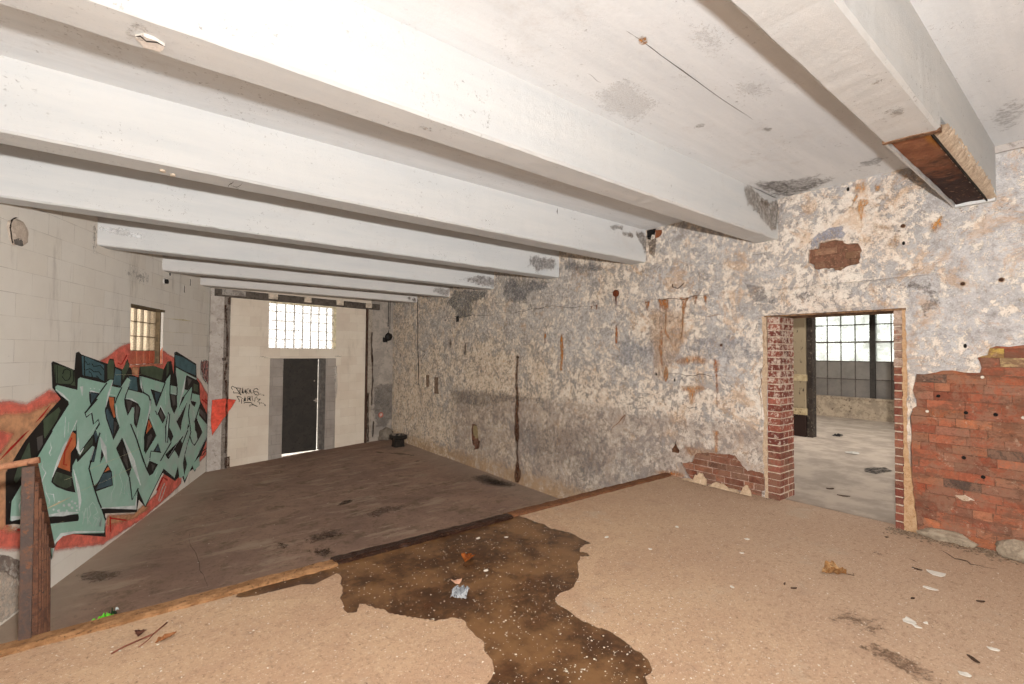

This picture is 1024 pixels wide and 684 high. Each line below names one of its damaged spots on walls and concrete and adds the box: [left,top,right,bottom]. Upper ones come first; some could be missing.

crack [627,31,752,119]
spalling [882,123,997,205]
spalling [7,217,29,246]
spalling [809,226,862,271]
corrosion [645,295,707,381]
spalling [682,317,769,498]
spalling [902,310,1024,551]
leakage [236,516,652,684]